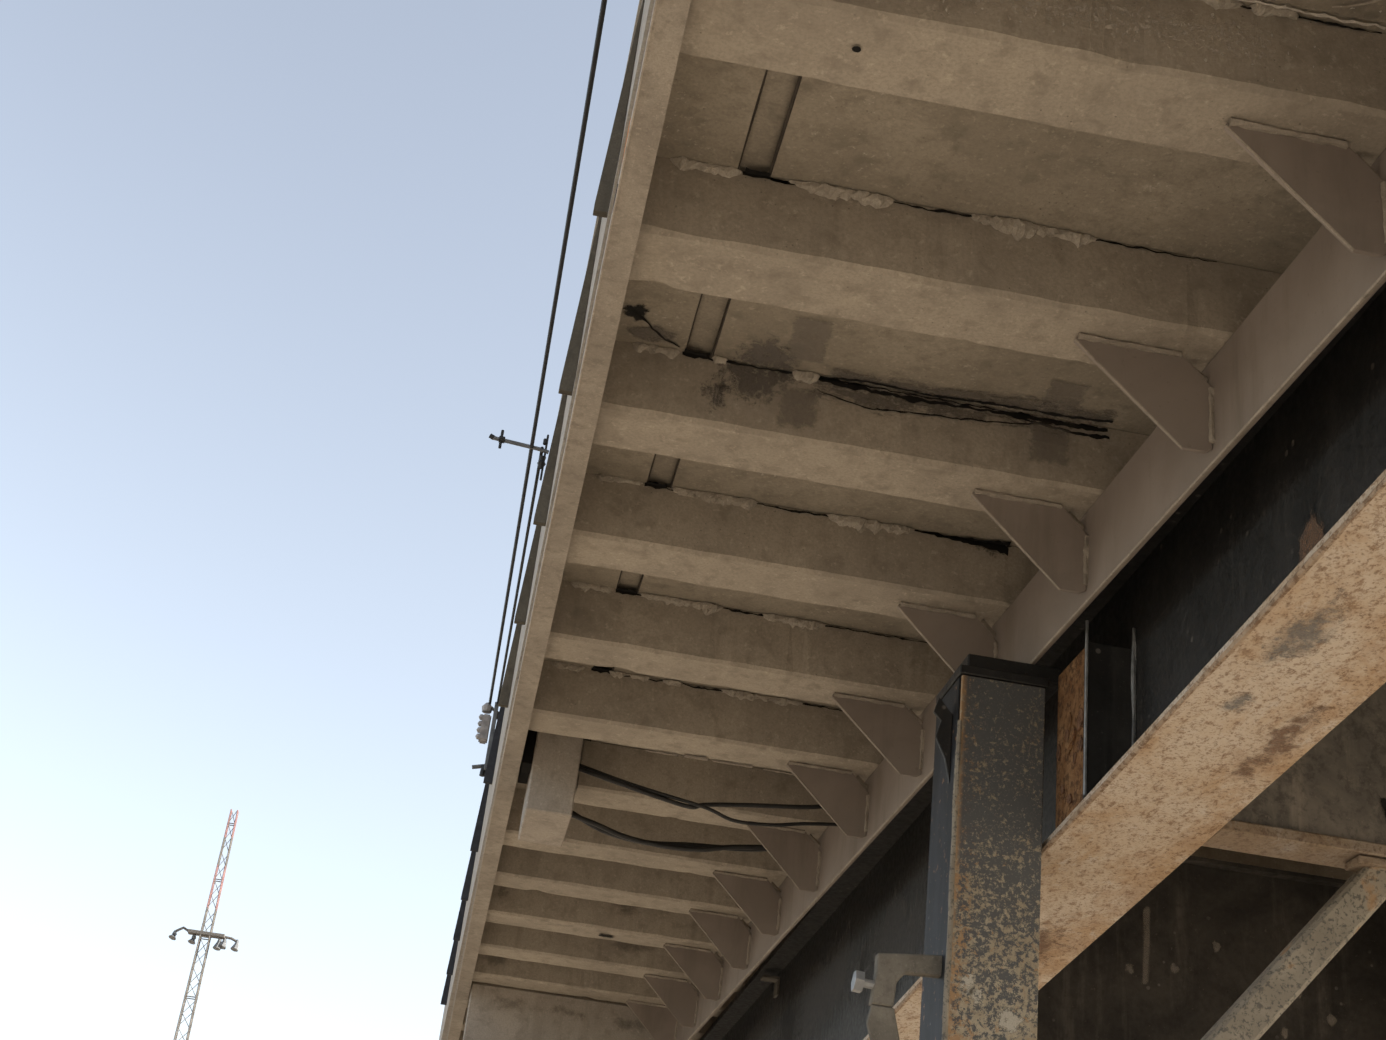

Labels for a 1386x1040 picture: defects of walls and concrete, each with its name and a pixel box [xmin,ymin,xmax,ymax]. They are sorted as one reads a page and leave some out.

crack [1299,16,1382,34]
crack [894,201,972,217]
crack [1096,239,1217,262]
crack [623,305,680,347]
leakage [702,339,800,410]
crack [726,360,1113,439]
crack [757,503,828,517]
crack [914,530,1012,556]
rust [1299,515,1324,559]
rust [1234,707,1327,776]